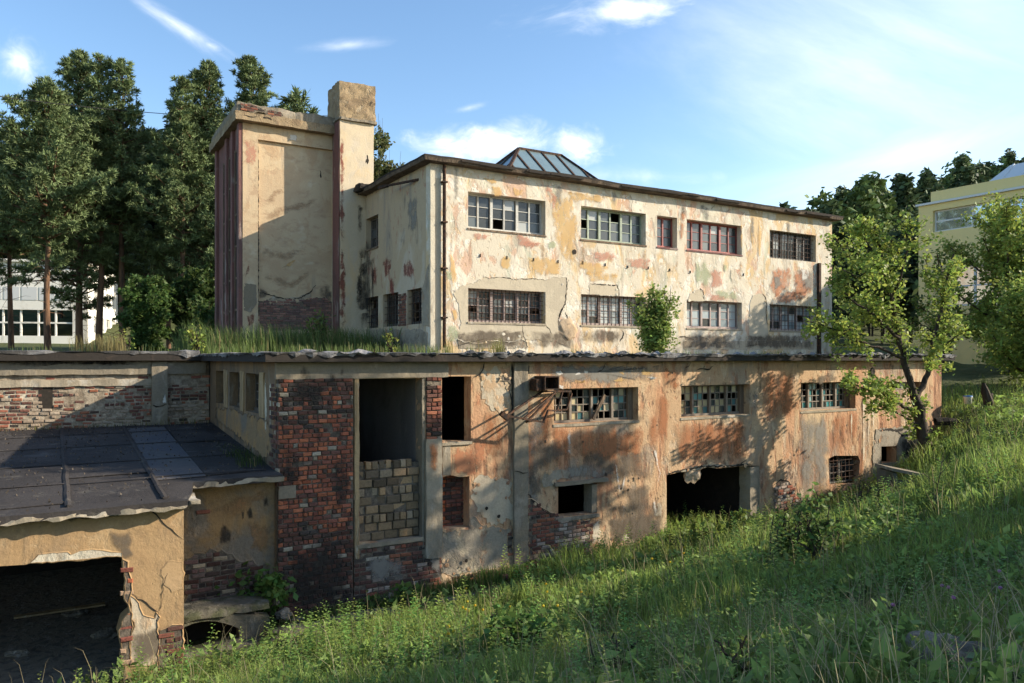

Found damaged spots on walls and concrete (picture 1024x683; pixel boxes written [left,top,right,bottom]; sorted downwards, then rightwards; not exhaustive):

crack [258,150,316,301]
flaking render [243,283,332,332]
water stain [357,246,394,319]
peeling [748,268,811,341]
peeling [479,366,513,414]
corrosion [766,373,794,415]
corrosion [680,423,745,459]
peeling [441,474,513,585]
flaking render [528,497,598,563]
flaking render [774,481,799,513]
flaking render [29,549,185,669]
crack [133,575,167,622]